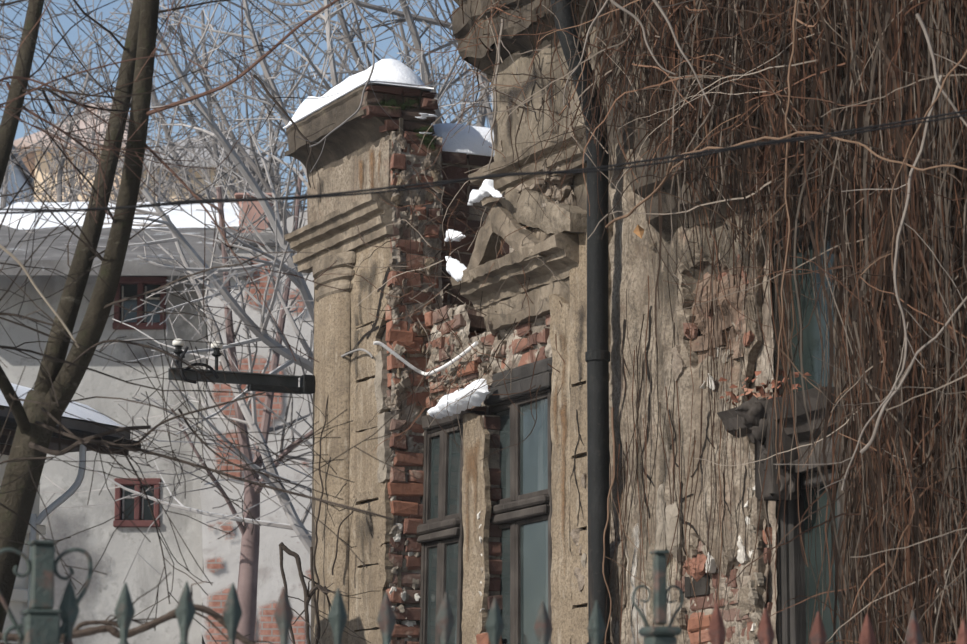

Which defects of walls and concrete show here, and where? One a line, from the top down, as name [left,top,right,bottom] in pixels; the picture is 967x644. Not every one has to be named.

flaking render [391,148,442,227]
flaking render [671,254,755,381]
peeling [700,373,715,390]
flaking render [374,257,507,644]
flaking render [670,462,773,644]
flaking render [205,587,231,644]
flaking render [255,601,281,644]
flaking render [291,616,306,644]